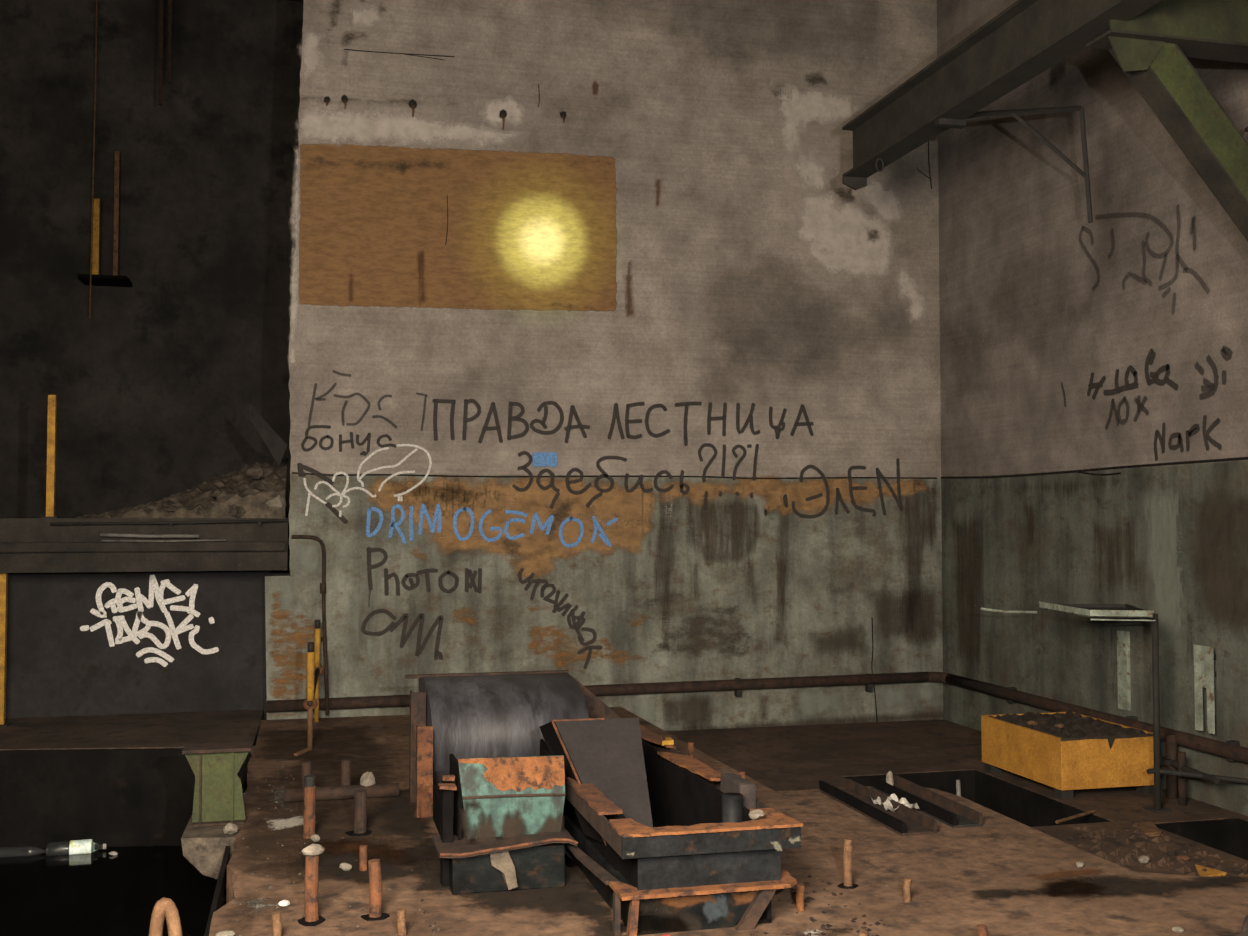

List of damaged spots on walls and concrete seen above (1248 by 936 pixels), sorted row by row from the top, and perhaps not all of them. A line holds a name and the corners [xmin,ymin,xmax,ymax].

damp [655,497,744,656]
damp [687,500,788,562]
corrosion [271,593,315,699]
corrosion [528,626,641,669]